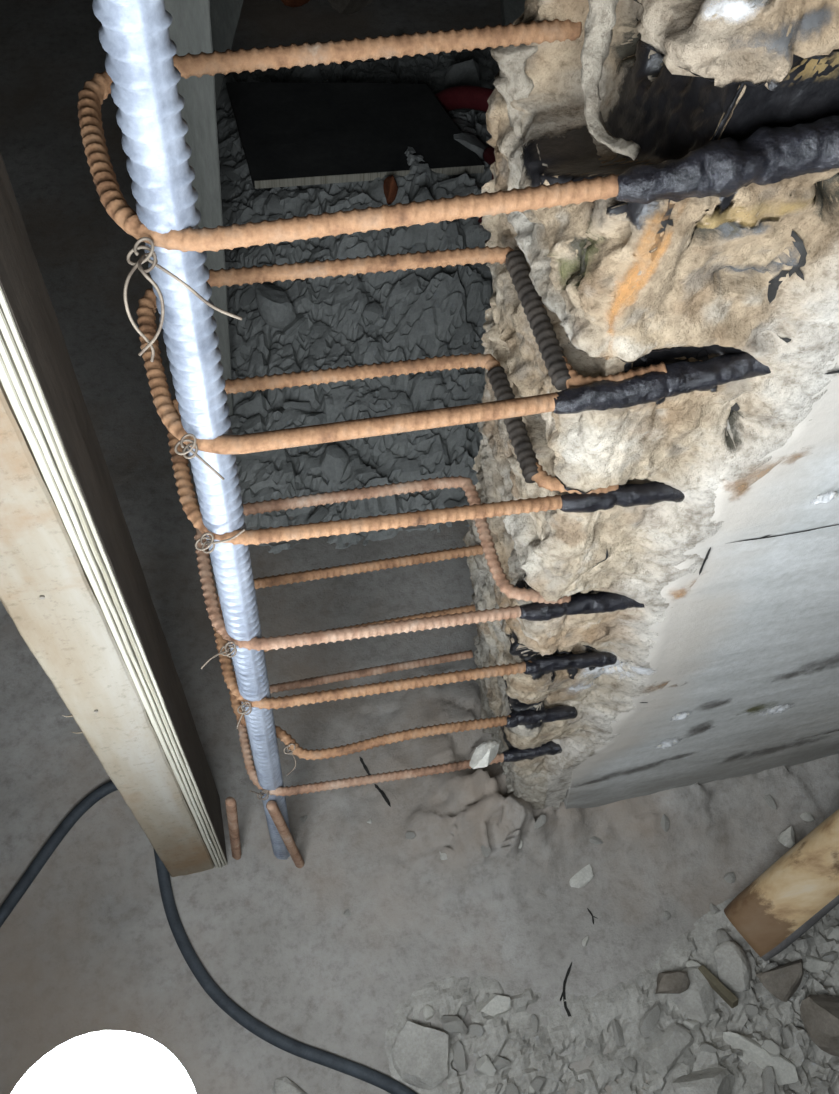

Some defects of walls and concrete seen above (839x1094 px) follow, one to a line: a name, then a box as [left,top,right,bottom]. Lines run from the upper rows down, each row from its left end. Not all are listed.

spalling [481,0,839,194]
corrosion [612,236,669,314]
spalling [463,168,839,810]
crack [699,524,839,575]